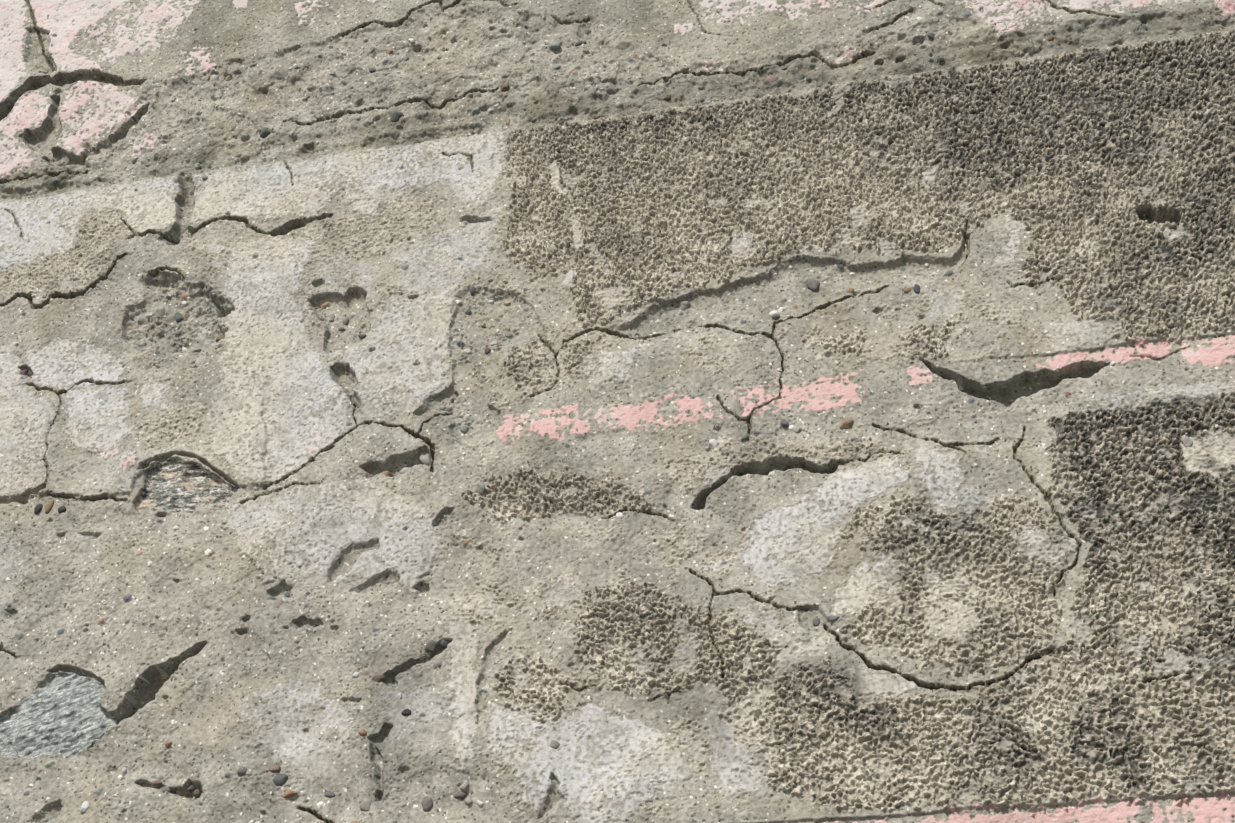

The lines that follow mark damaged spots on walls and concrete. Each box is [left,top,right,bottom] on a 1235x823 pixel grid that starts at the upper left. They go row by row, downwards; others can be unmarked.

peeling [698,0,784,25]
peeling [954,0,1191,34]
peeling [1215,0,1235,14]
crack [0,215,275,309]
crack [529,284,889,441]
spalling [906,330,1235,407]
crack [25,378,128,503]
flaking render [133,457,238,514]
crack [240,394,454,505]
crack [840,423,1084,597]
crack [689,567,1058,693]
flaking render [0,640,208,759]